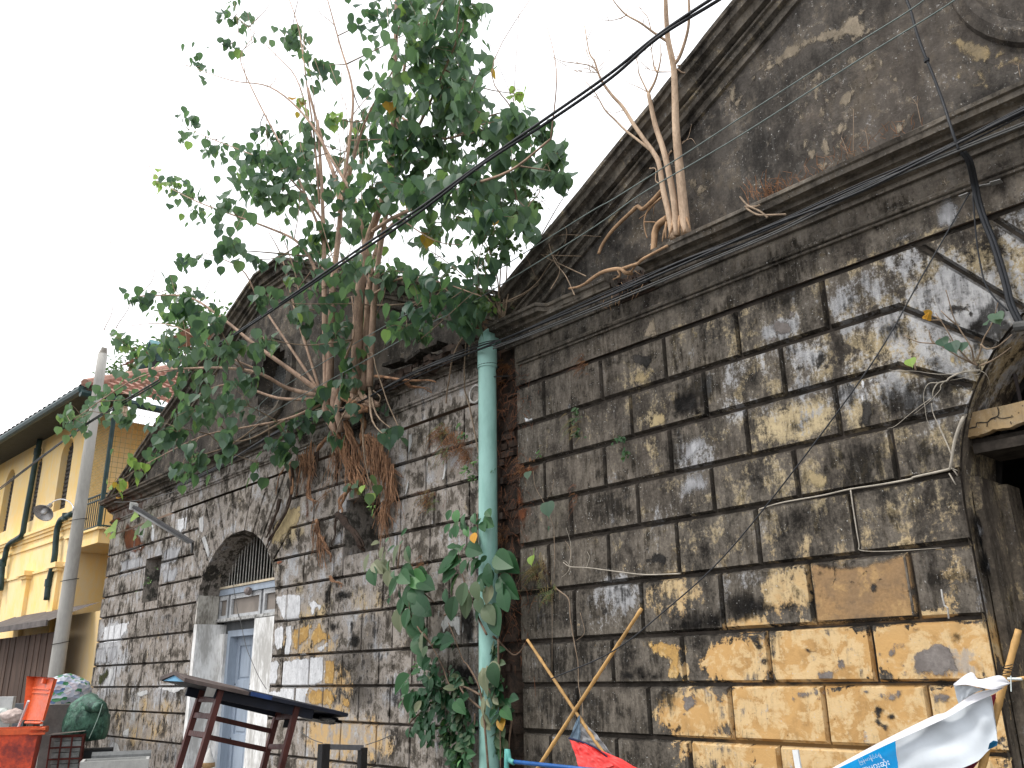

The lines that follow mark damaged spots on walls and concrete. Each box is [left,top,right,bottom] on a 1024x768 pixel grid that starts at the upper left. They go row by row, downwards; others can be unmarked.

peeling [752,11,875,79]
water stain [644,318,657,338]
water stain [948,304,983,332]
water stain [673,393,699,418]
water stain [861,401,873,425]
crack [969,407,1014,429]
water stain [686,440,704,458]
water stain [685,476,704,492]
water stain [646,549,668,566]
peeling [275,625,305,660]
peeling [668,669,696,732]